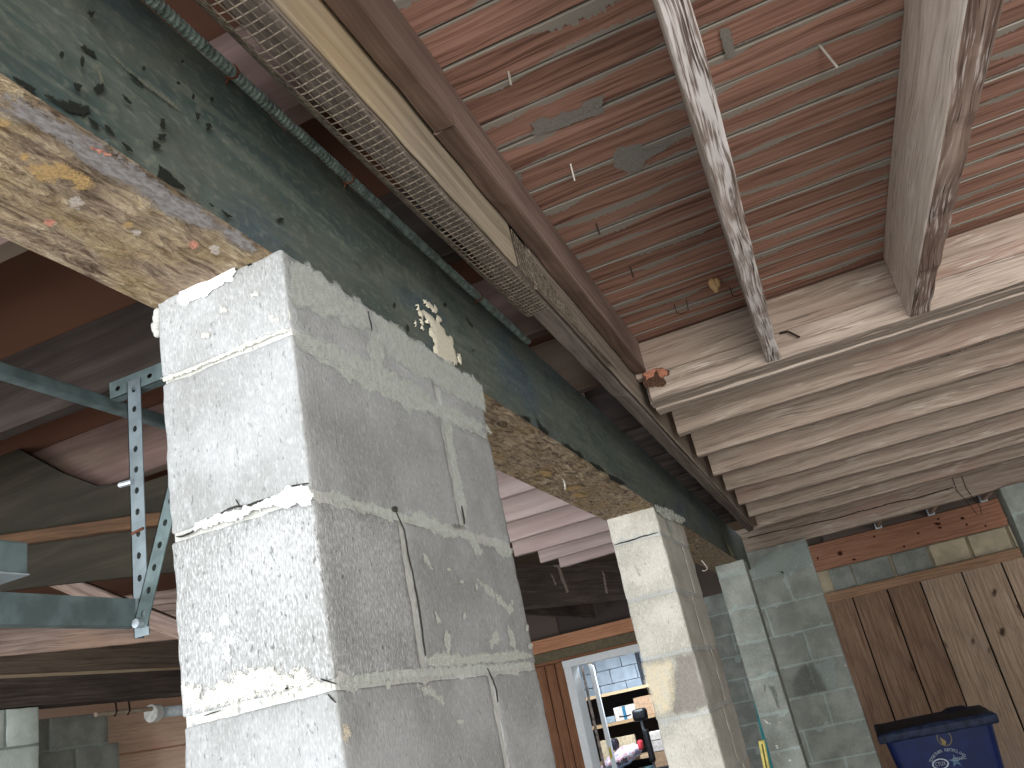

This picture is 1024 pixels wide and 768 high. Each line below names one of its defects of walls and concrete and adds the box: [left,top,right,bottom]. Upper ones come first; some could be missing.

spalling [79,45,96,67]
peeling [0,76,258,266]
spalling [143,0,531,344]
crack [396,512,426,656]
crack [748,487,953,538]